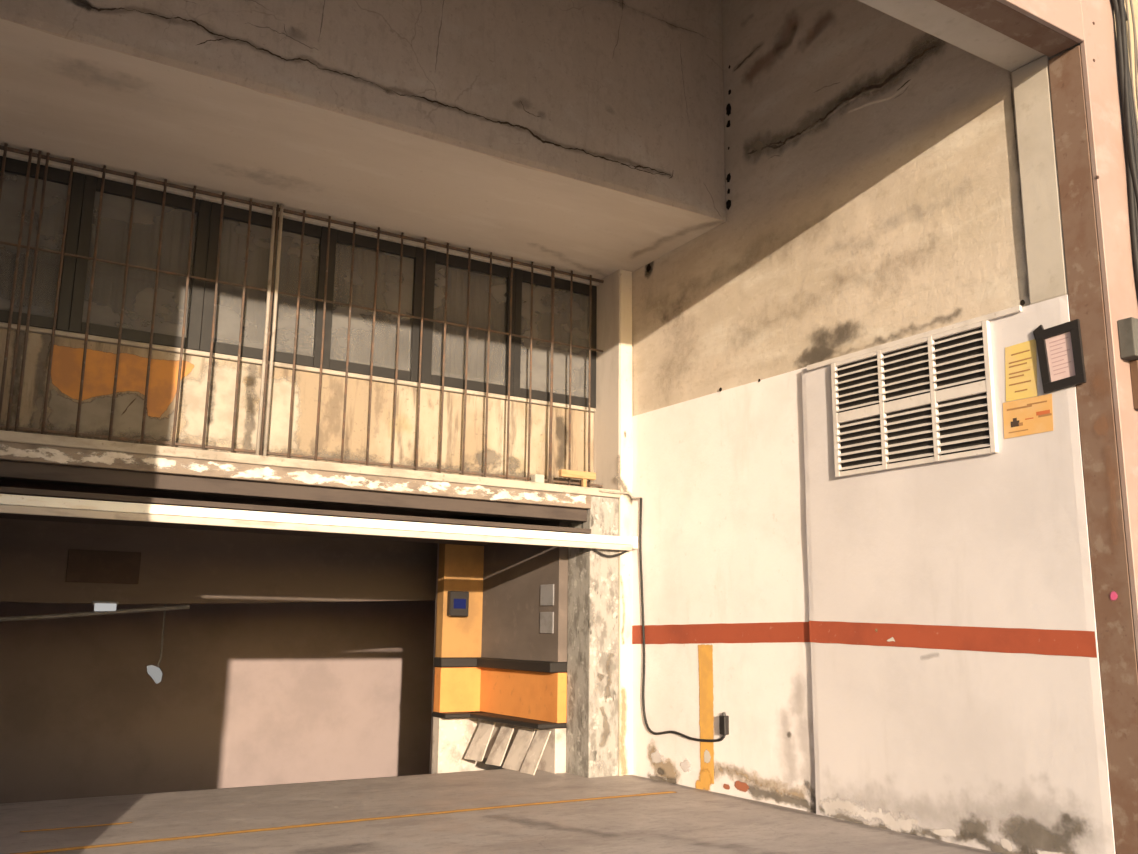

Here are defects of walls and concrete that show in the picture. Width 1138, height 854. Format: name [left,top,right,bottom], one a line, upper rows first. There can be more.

crack [90,5,673,178]
crack [744,29,944,158]
peeling [48,345,299,452]
peeling [0,444,586,504]
flaking render [723,781,749,792]
peeling [822,797,956,838]
peeling [1000,838,1013,851]